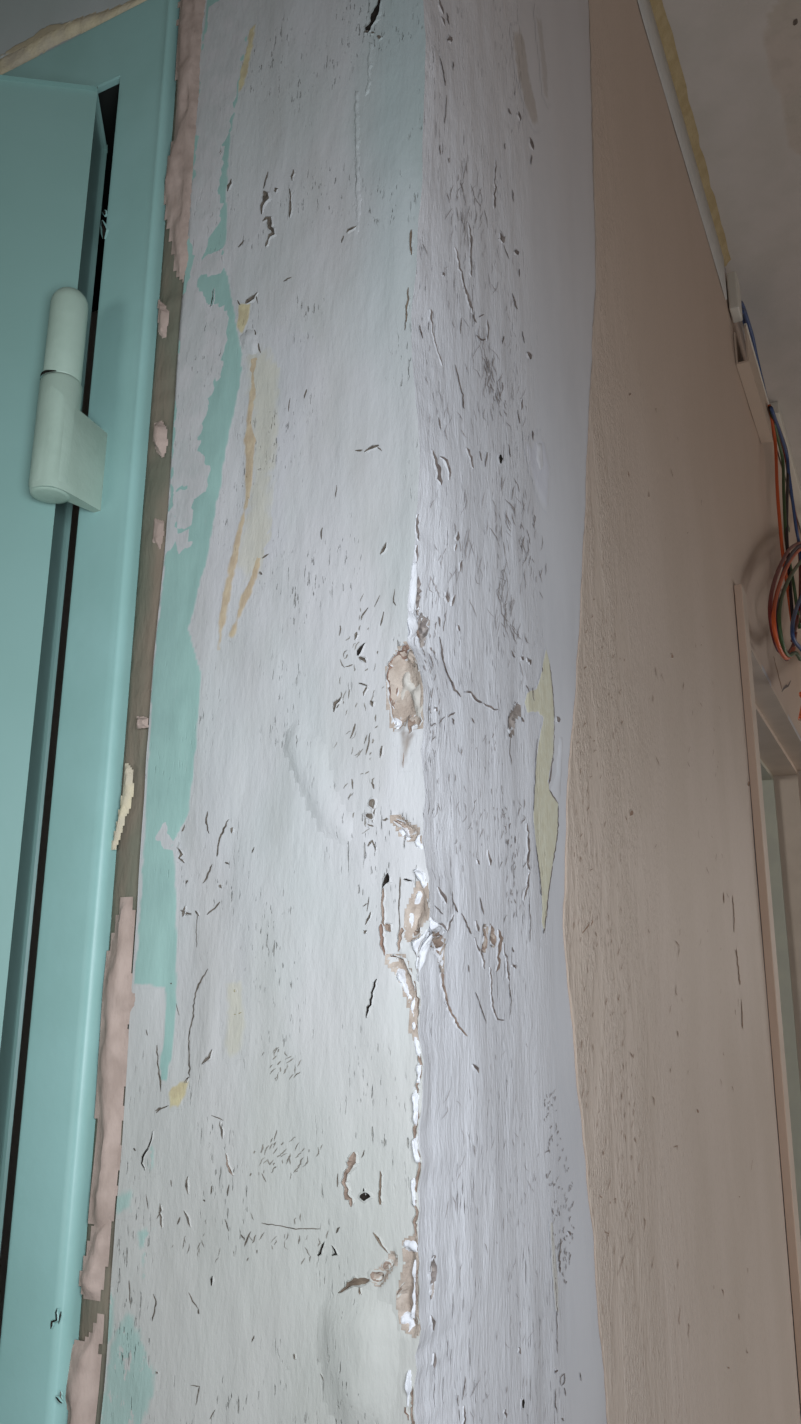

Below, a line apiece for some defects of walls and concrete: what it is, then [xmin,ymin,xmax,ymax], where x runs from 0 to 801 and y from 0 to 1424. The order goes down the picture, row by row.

flaking render [0,0,147,75]
crack [363,0,383,41]
crack [419,0,534,438]
spalling [339,514,461,734]
spalling [364,782,423,852]
peeling [524,647,563,934]
spalling [337,869,467,1338]
peeling [100,1282,162,1424]
spalling [404,1370,415,1424]